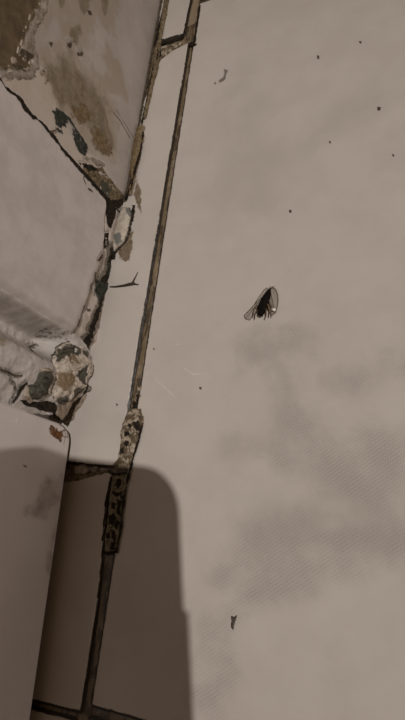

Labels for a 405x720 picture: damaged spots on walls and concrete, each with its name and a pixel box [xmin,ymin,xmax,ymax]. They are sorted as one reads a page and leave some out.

peeling [0,0,49,84]
leakage [48,61,113,157]
crack [0,78,135,350]
spalling [79,156,124,202]
spalling [22,250,105,421]